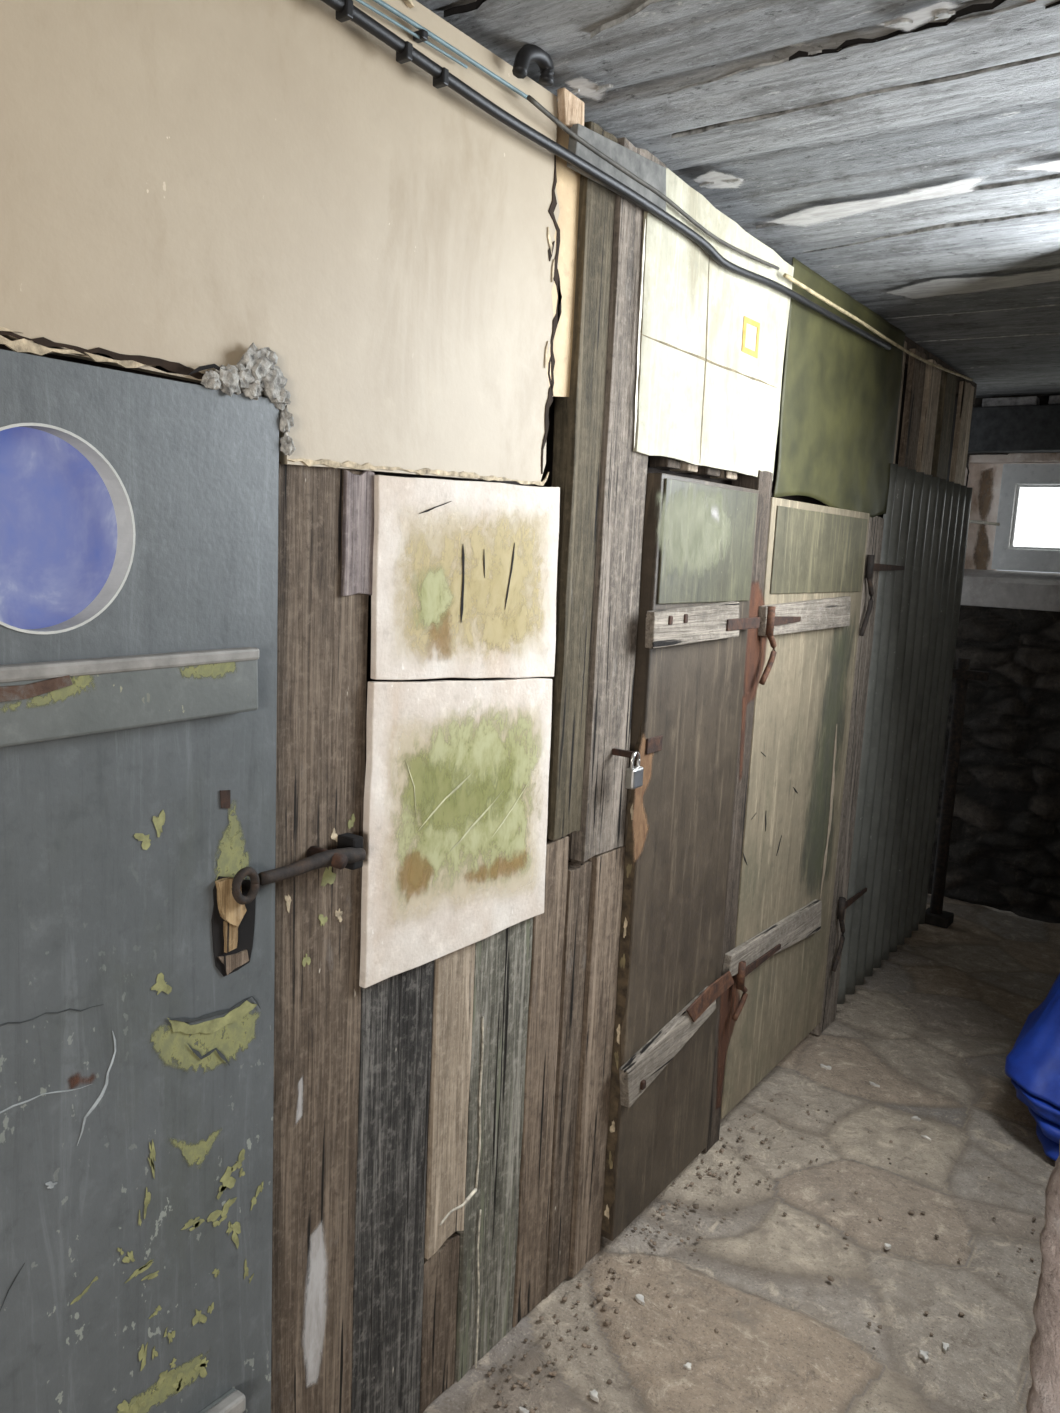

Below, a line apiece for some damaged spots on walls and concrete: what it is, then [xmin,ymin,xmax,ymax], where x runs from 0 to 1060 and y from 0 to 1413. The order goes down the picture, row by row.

crack [541,155,562,474]
rust [740,582,767,778]
peeling [134,810,165,850]
peeling [151,973,172,995]
peeling [151,996,261,1072]
rust [716,974,740,1109]
peeling [138,1130,220,1226]
peeling [181,1149,263,1283]
peeling [117,1248,159,1283]
peeling [117,1305,209,1413]
peeling [192,1302,214,1326]